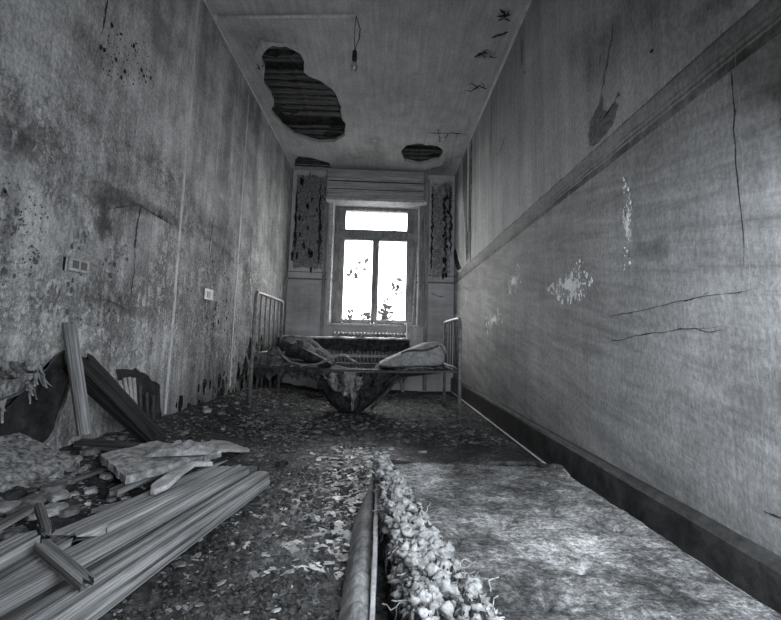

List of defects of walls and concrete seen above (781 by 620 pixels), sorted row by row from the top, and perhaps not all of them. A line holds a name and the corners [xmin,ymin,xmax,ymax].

peeling [291,172,326,273]
peeling [430,138,472,280]
peeling [547,259,593,304]
crack [610,289,752,317]
crack [607,327,719,342]